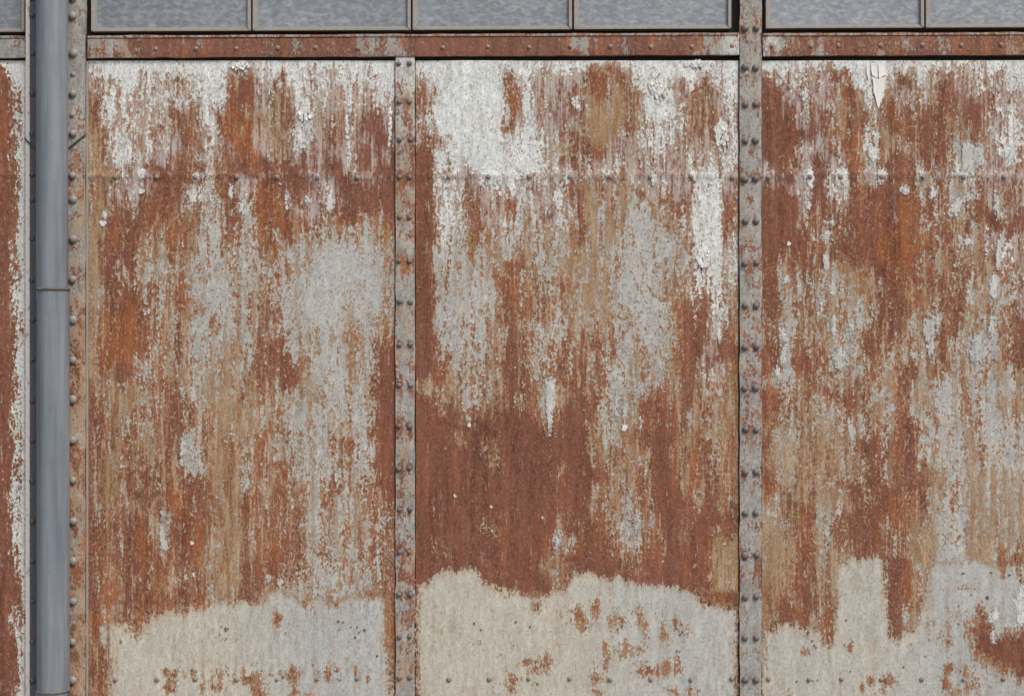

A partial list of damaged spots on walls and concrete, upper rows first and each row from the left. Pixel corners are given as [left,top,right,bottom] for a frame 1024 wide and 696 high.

peeling [229,61,251,74]
peeling [684,59,707,71]
peeling [852,63,887,108]
peeling [184,153,247,215]
peeling [802,167,815,210]
peeling [832,163,850,190]
peeling [900,171,938,199]
peeling [946,103,1019,218]
rust [0,60,26,696]
rust [88,60,395,696]
rust [416,60,740,696]
rust [762,60,1024,696]